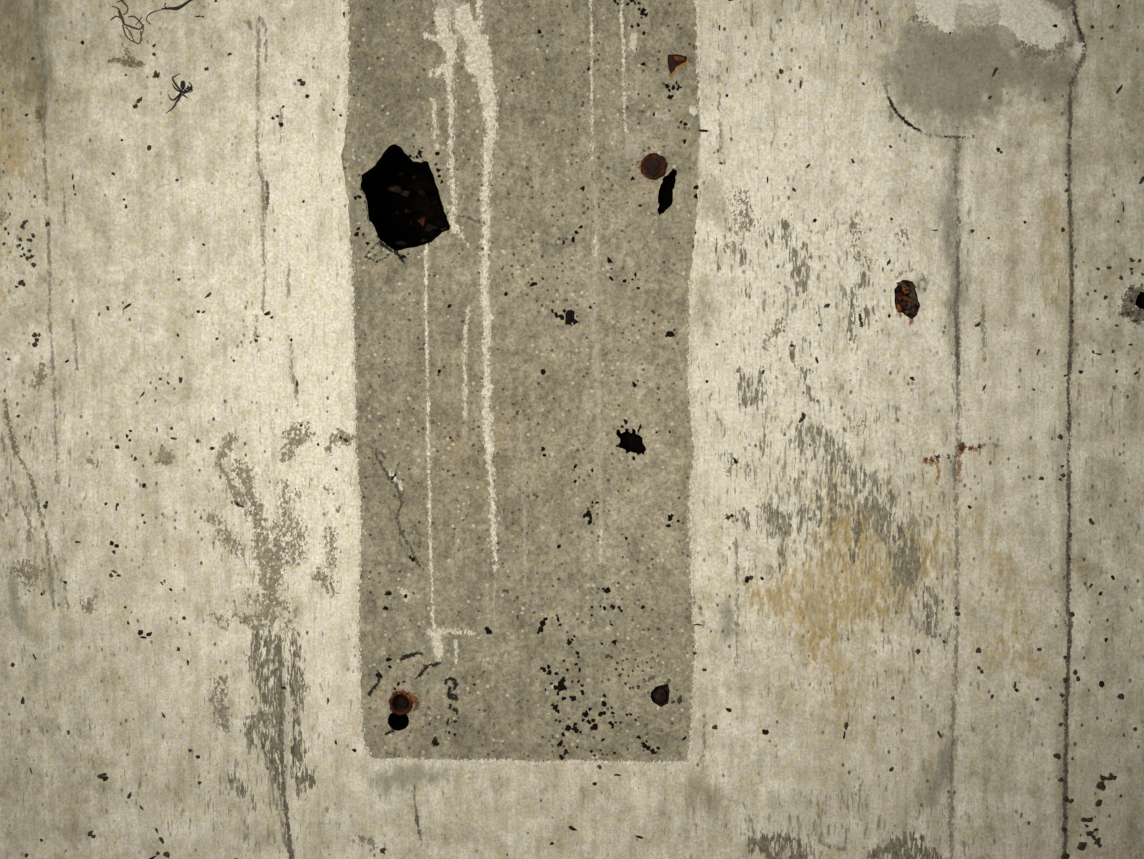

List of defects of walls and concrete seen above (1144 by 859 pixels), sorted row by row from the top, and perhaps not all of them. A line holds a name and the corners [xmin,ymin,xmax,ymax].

efflorescence [423,243,477,664]
efflorescence [423,0,500,572]
peeling [278,0,701,763]
rust [894,280,920,324]